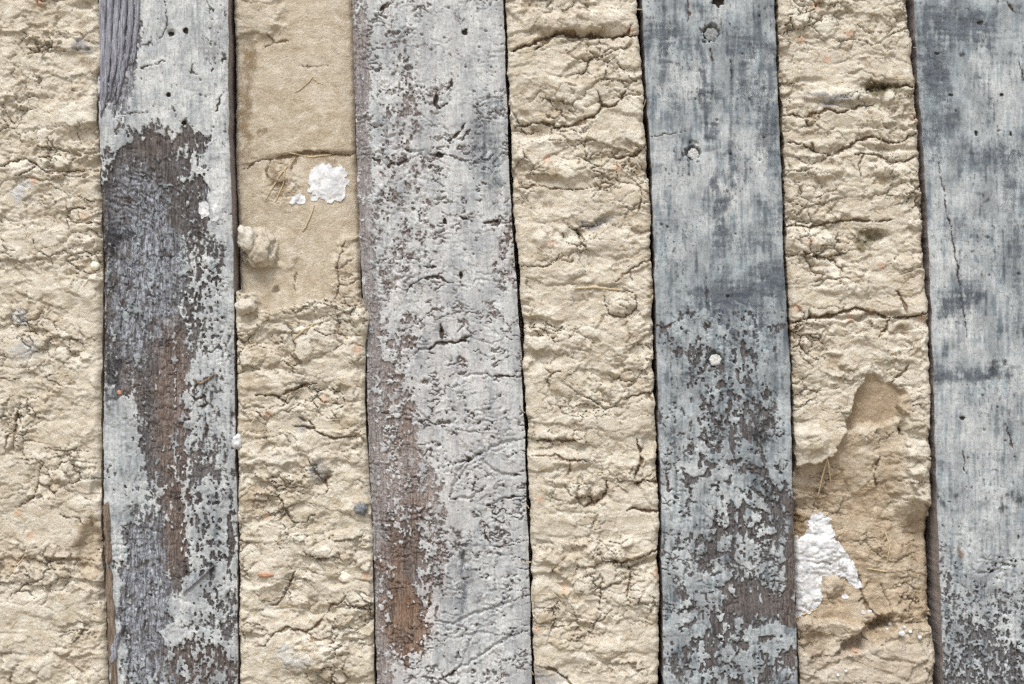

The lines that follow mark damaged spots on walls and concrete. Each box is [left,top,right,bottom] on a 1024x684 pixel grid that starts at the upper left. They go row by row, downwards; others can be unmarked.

crack [512,25,636,52]
crack [518,91,626,129]
crack [784,81,916,174]
crack [519,131,686,212]
crack [790,218,891,272]
spalling [103,0,528,684]
crack [604,259,650,318]
crack [792,291,927,337]
crack [528,438,608,507]
crack [627,439,672,513]
spalling [662,299,932,684]
crack [594,550,656,605]